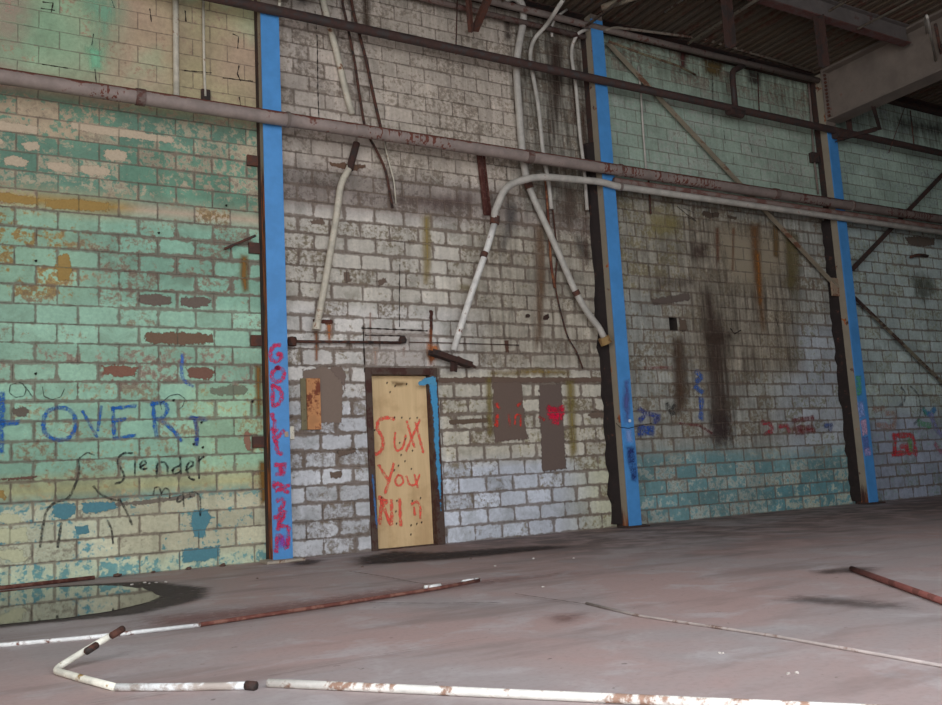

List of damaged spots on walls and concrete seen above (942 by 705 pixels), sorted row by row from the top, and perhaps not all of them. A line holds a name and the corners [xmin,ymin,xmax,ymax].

peeling [0,120,40,169]
peeling [46,149,127,177]
peeling [69,121,174,144]
peeling [55,253,72,282]
rust [751,226,764,327]
spalling [138,293,211,309]
spalling [144,331,213,346]
spalling [185,366,248,396]
water stain [674,339,686,410]
water stain [705,294,729,439]
peeling [52,494,195,535]
peeling [181,508,220,563]